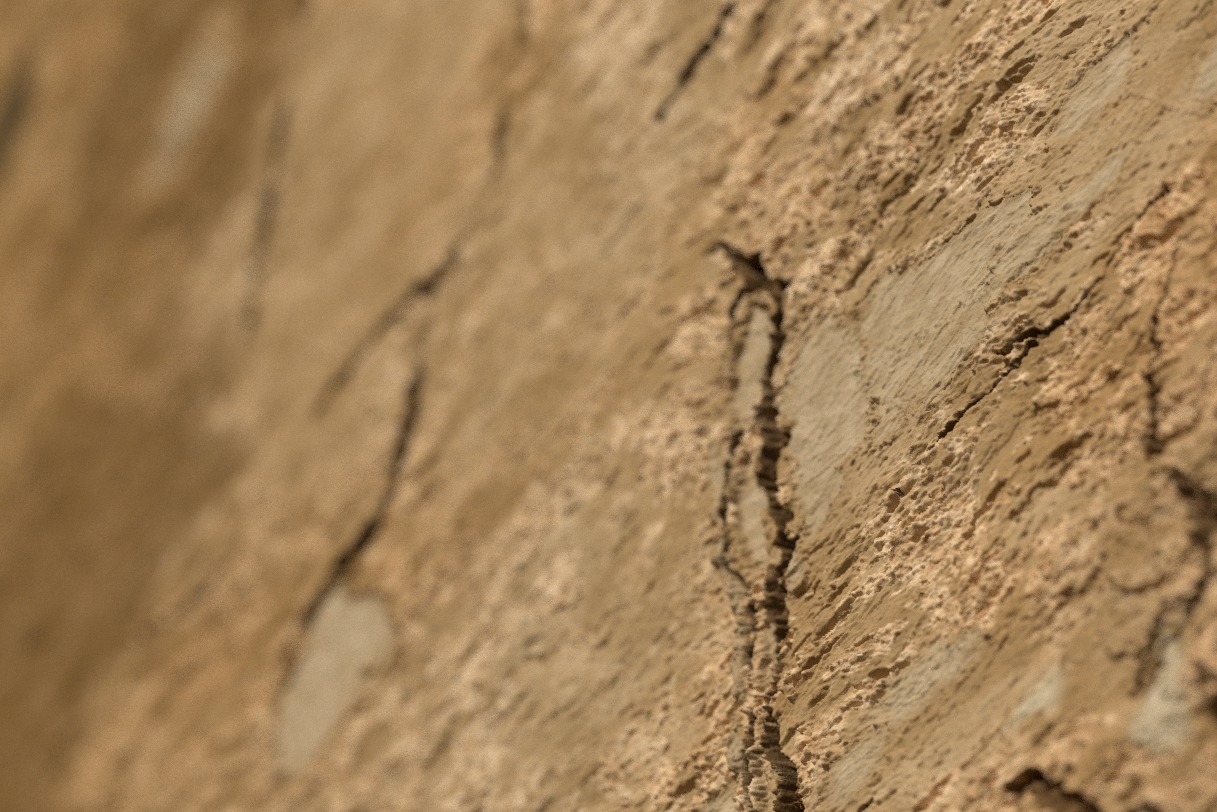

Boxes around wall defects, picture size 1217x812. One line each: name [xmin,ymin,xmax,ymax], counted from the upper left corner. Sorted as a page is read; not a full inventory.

crack [490,90,510,179]
spalling [271,561,412,788]
crack [276,344,426,690]
crack [315,239,463,415]
crack [705,241,809,812]
crack [1134,247,1217,724]